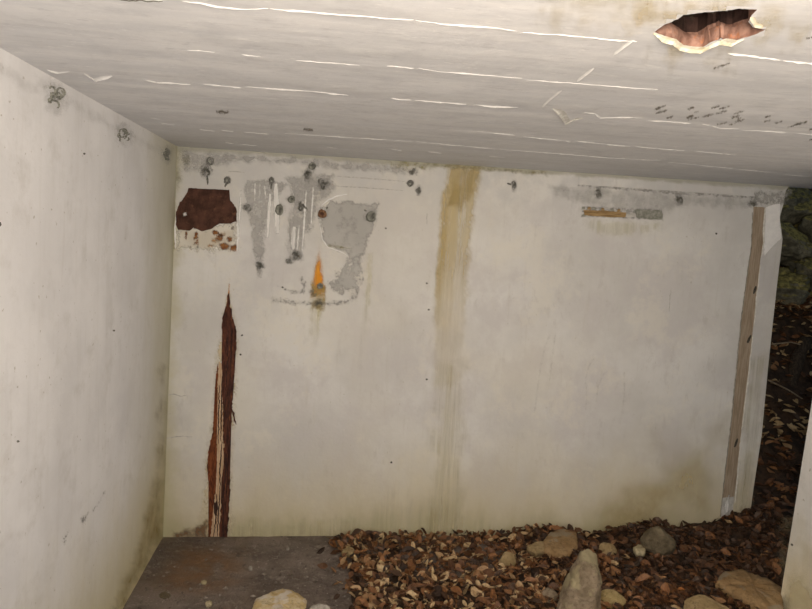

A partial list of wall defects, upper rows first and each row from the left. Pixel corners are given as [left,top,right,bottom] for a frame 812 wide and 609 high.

peeling [182,1,513,31]
peeling [523,32,637,42]
spalling [654,9,812,69]
peeling [654,106,812,140]
peeling [176,222,237,252]
peeling [245,158,379,305]
damp [442,168,479,257]
rust [312,261,325,301]